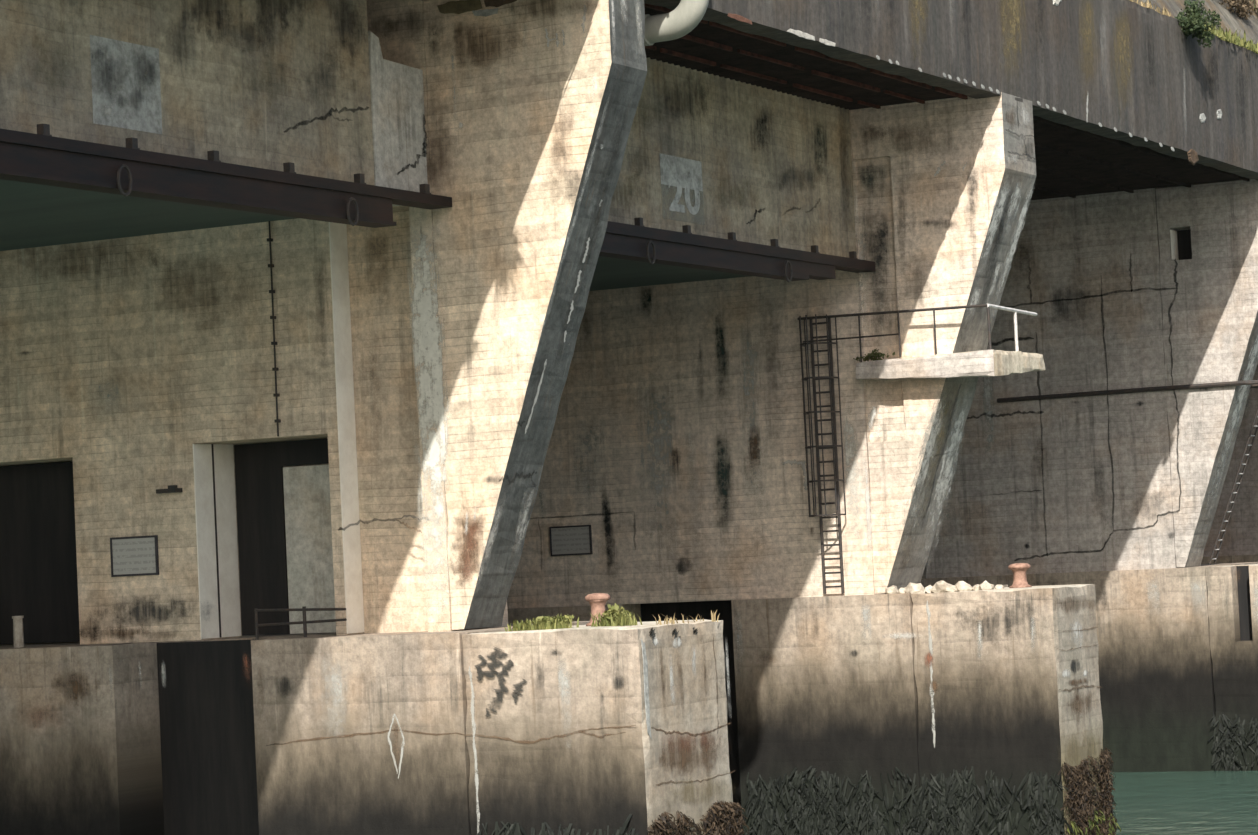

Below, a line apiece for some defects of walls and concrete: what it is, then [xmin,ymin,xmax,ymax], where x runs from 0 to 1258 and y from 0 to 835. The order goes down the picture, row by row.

crack [284,106,369,132]
crack [398,114,427,175]
leakage [716,327,727,391]
crack [967,254,1182,561]
leakage [716,440,730,518]
crack [338,515,429,533]
rust [453,517,479,579]
leakage [388,714,404,778]
crack [266,666,732,833]